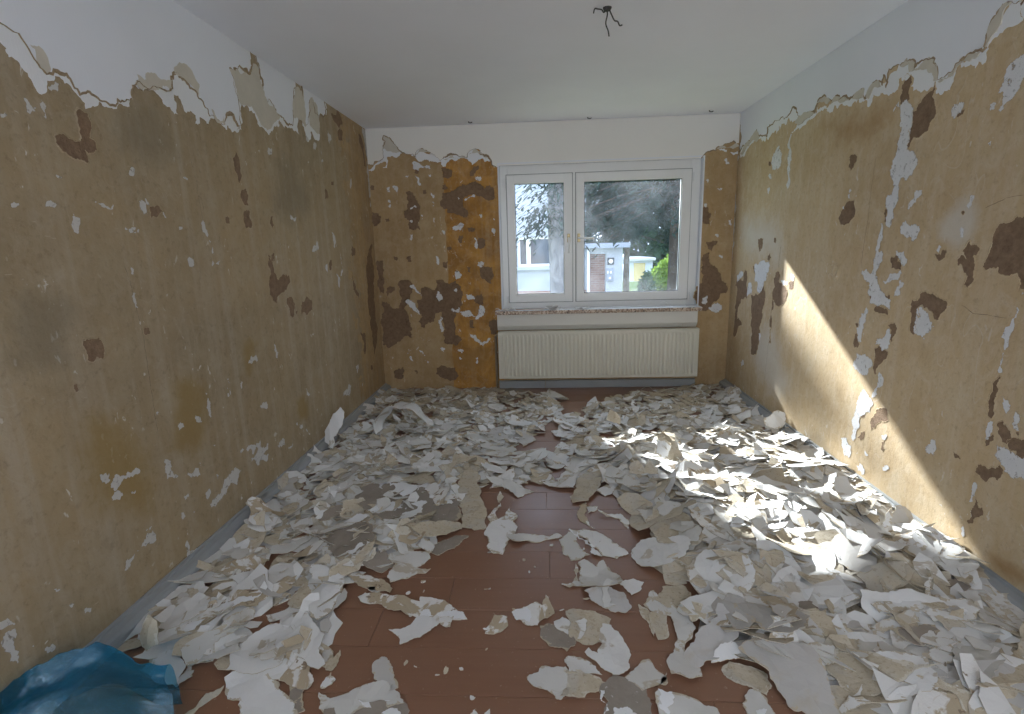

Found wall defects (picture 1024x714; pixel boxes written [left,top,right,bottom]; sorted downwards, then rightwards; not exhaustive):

peeling [24,98,47,118]
flaking render [53,106,99,164]
peeling [951,102,965,118]
peeling [990,54,1024,111]
flaking render [267,252,313,318]
flaking render [325,127,498,396]
flaking render [693,203,795,368]
peeling [841,73,949,475]
flaking render [934,195,1024,294]
flaking render [82,336,106,363]
peeling [100,468,140,500]